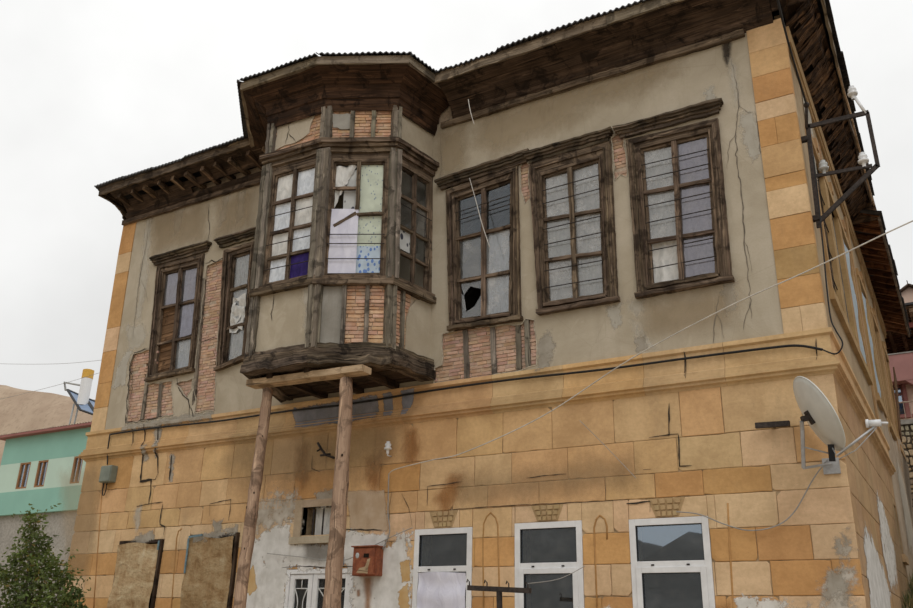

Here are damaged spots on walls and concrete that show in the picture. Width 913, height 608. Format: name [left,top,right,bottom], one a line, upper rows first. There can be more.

crack [711,59,761,348]
crack [125,228,175,534]
spalling [126,259,223,423]
spalling [433,318,537,383]
crack [649,407,692,467]
peeling [246,491,328,608]
peeling [344,490,414,608]
peeling [734,595,788,608]
peeling [808,492,898,608]